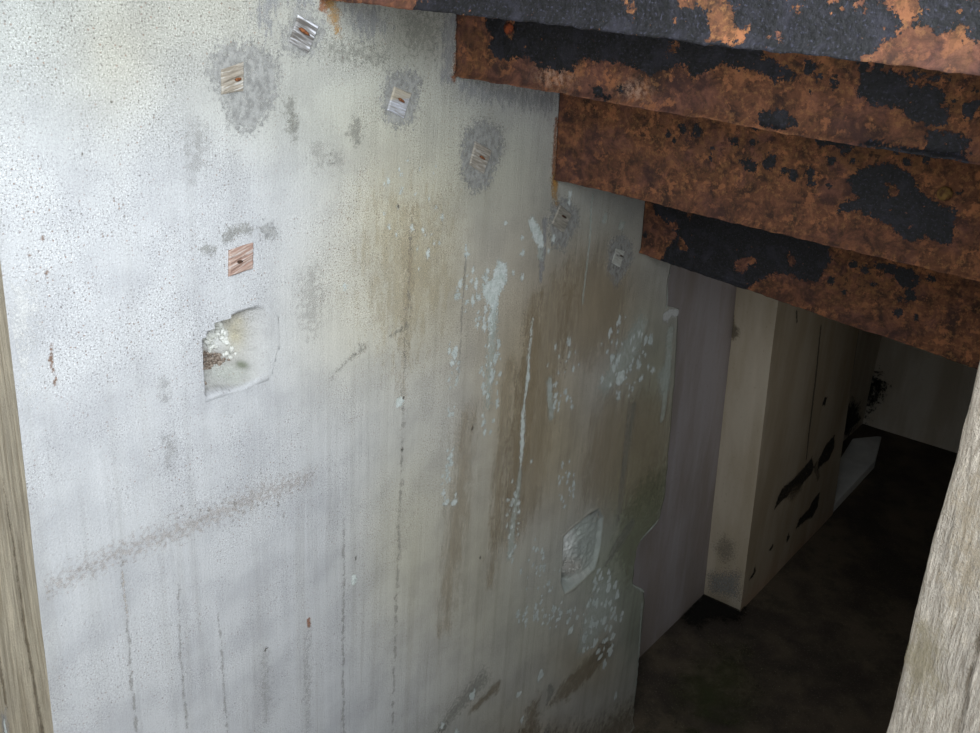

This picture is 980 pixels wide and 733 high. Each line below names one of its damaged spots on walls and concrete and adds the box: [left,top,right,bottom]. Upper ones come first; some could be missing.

rust [319,0,342,35]
damp [519,190,582,257]
spalling [202,303,280,403]
damp [454,244,524,438]
damp [519,321,533,469]
damp [546,338,580,412]
damp [600,315,655,402]
damp [844,365,891,440]
damp [505,480,624,671]
spalling [558,505,606,598]